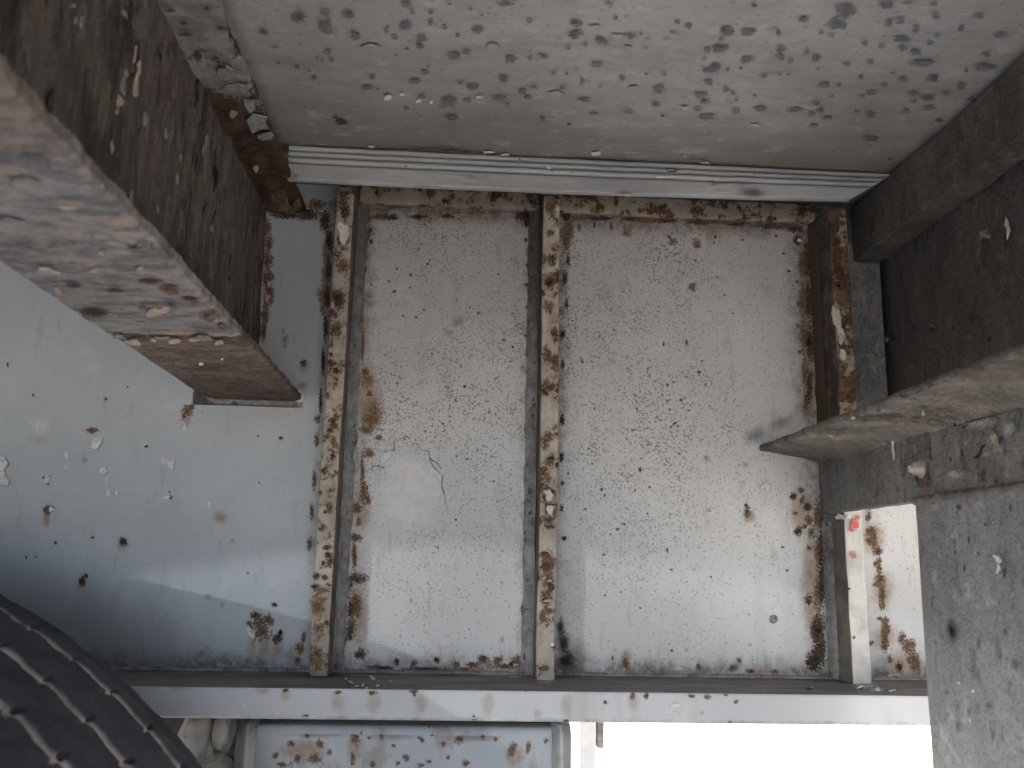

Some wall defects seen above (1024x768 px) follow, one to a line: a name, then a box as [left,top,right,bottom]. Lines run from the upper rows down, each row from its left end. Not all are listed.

peeling [194,25,290,205]
corrosion [367,213,428,245]
peeling [63,427,119,496]
corrosion [244,195,351,668]
corrosion [346,293,521,671]
corrosion [543,414,565,486]
corrosion [538,555,555,624]
corrosion [784,478,827,675]
corrosion [862,509,926,677]
corrosion [268,730,548,768]